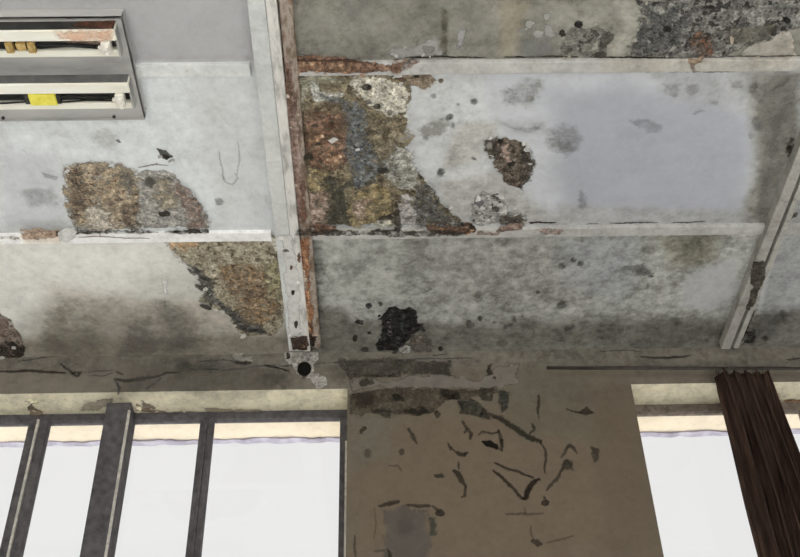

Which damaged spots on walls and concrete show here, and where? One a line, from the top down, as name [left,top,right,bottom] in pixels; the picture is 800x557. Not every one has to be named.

flaking render [626,0,800,59]
flaking render [58,74,536,339]
corrosion [283,55,419,351]
flaking render [0,314,25,359]
spalling [353,302,443,354]
flaking render [741,261,766,343]
crack [0,356,292,395]
peeling [350,363,520,392]
crack [461,421,473,440]
crack [484,395,547,473]
crack [452,461,468,498]
crack [378,500,440,514]